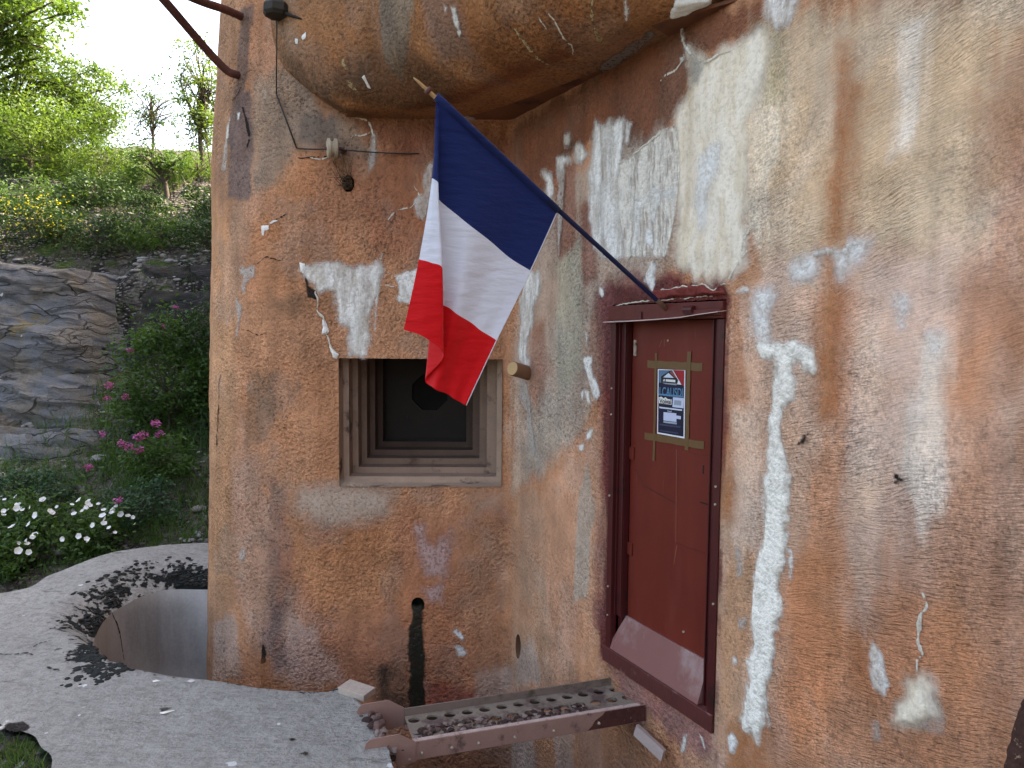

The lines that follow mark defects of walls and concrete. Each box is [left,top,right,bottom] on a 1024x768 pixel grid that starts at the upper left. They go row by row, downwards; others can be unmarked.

spalling [299,262,417,359]
water stain [728,288,817,752]
water stain [408,525,450,707]
efflorescence [895,592,940,725]